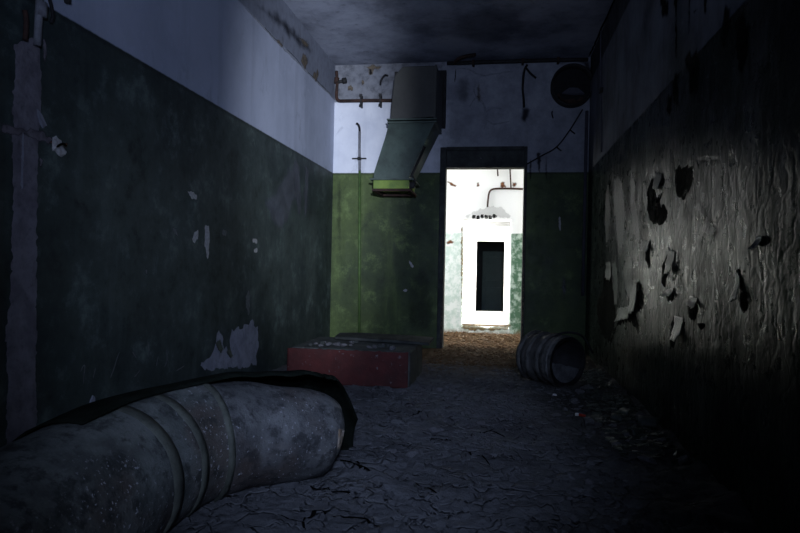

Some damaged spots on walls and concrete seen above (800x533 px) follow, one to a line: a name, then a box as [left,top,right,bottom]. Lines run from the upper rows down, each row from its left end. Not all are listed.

spalling [49,136,67,157]
peeling [192,225,210,259]
peeling [596,165,692,344]
peeling [747,236,770,250]
peeling [728,269,748,313]
peeling [201,290,259,371]
peeling [669,296,705,350]
crack [340,459,372,471]
crack [278,485,378,529]